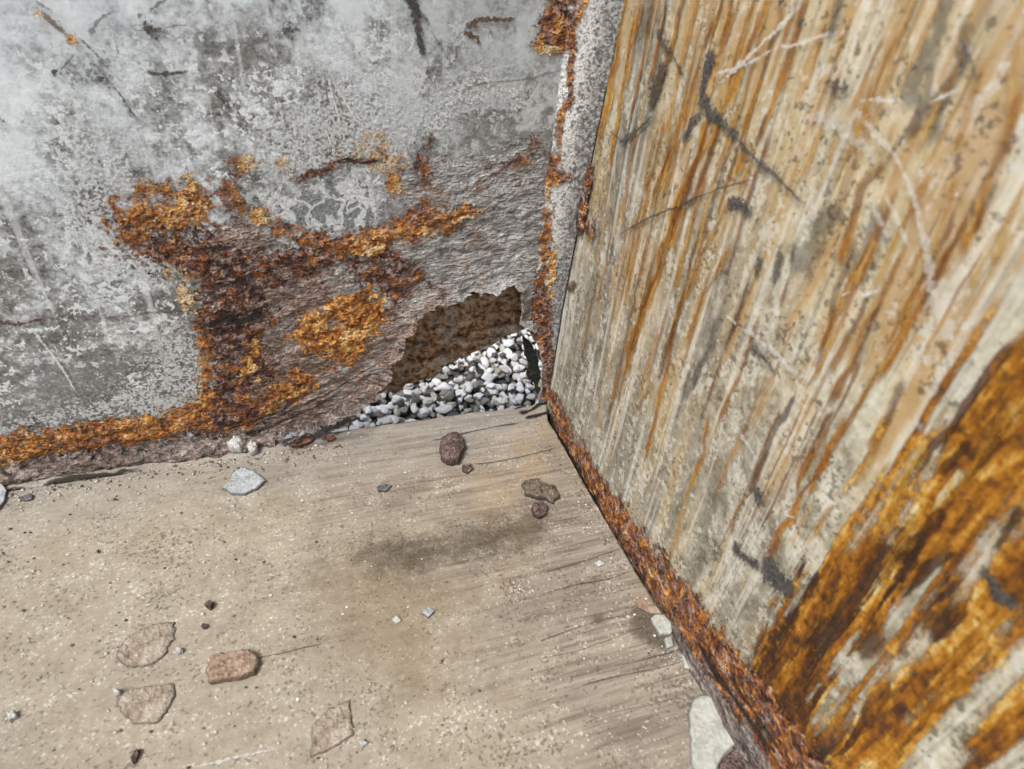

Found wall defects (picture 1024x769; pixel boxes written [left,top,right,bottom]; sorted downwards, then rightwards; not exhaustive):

rust [0,130,487,474]
peeling [0,67,551,508]
rust [498,0,1024,769]